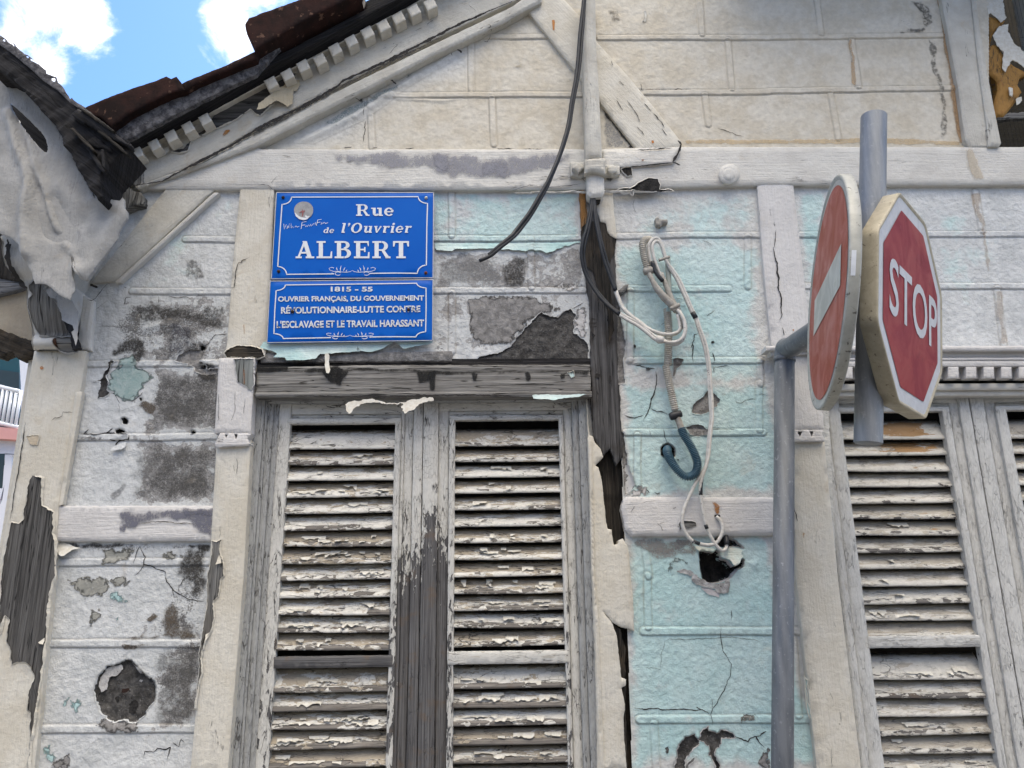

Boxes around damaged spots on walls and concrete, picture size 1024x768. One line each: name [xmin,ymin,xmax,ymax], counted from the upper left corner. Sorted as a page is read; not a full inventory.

peeling [987,0,1024,72]
water stain [337,152,564,177]
crack [773,232,784,333]
spalling [468,296,590,359]
water stain [139,401,156,414]
water stain [198,363,215,380]
crack [133,521,197,601]
peeling [0,475,134,768]
spalling [93,659,156,733]
peeling [461,676,562,738]
crack [637,611,757,723]
spalling [665,726,736,768]